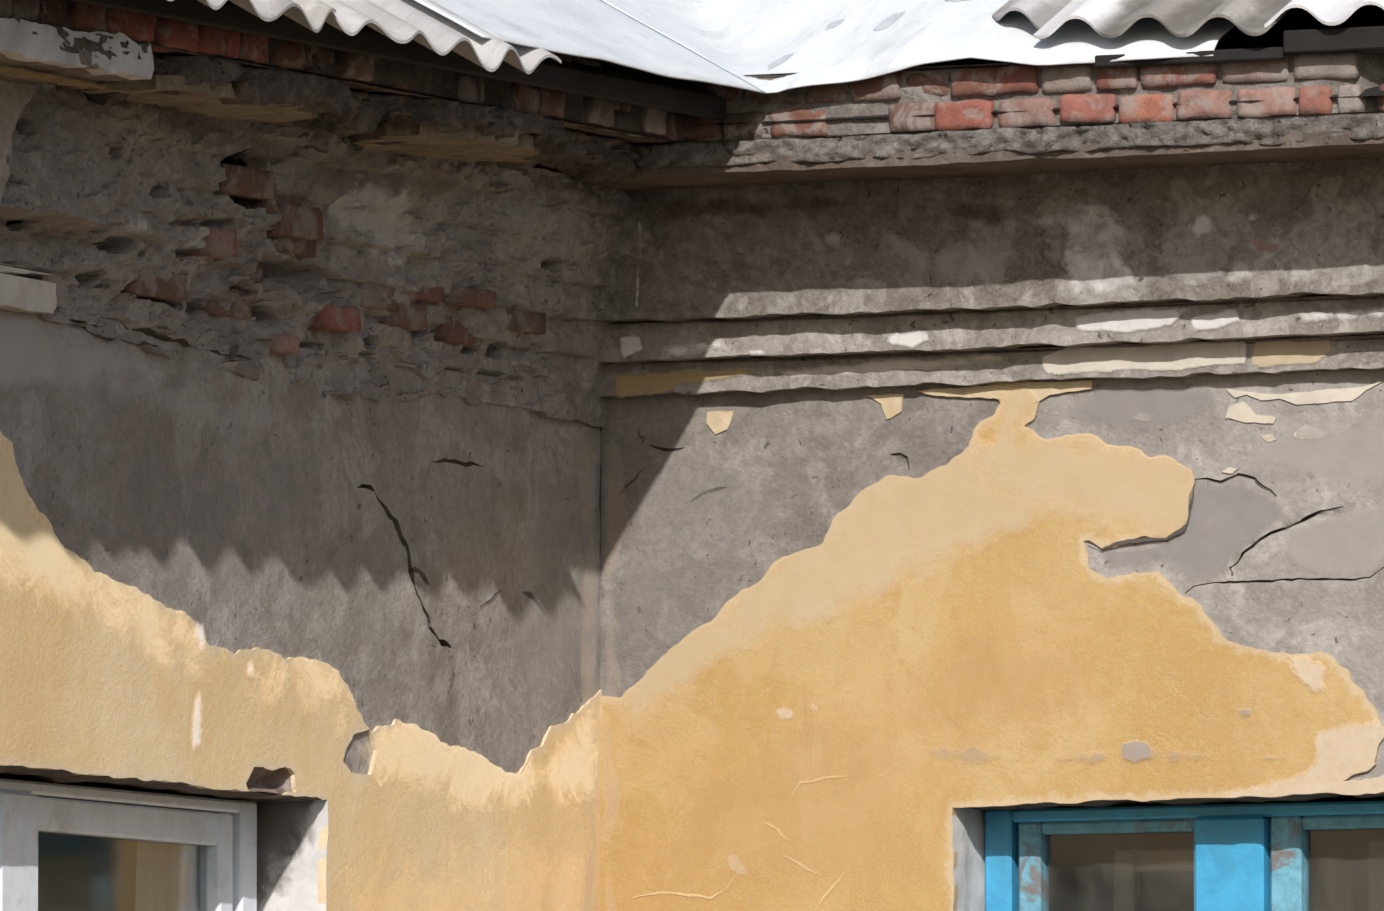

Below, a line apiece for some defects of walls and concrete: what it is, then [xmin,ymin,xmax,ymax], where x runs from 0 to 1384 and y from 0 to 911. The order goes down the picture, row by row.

peeling [0,68,107,89]
crack [432,458,481,467]
flaking render [0,83,1384,798]
crack [357,484,452,649]
crack [480,590,546,615]
crack [1087,473,1384,593]